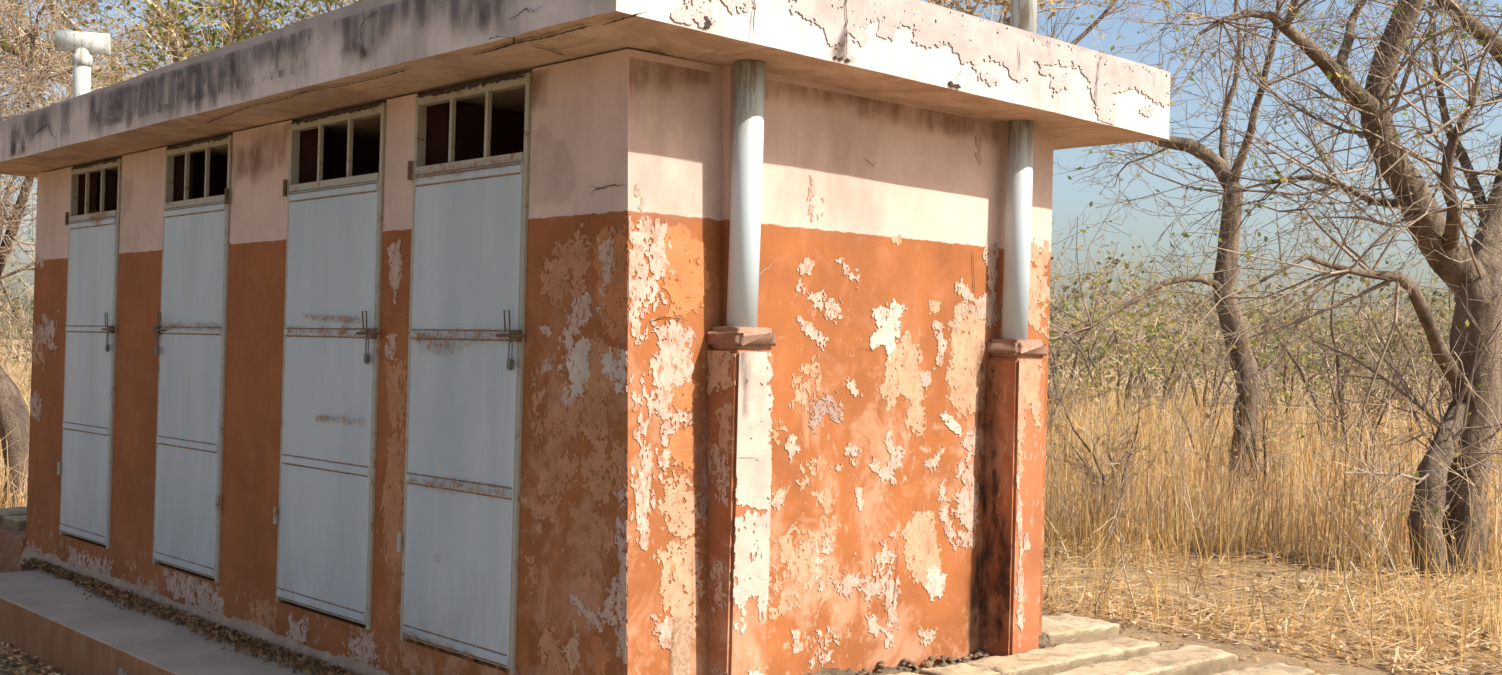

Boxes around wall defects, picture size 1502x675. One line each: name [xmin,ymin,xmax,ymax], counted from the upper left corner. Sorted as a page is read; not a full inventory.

damp [90,51,237,126]
damp [342,0,424,57]
peeling [790,0,1170,125]
damp [10,113,46,156]
peeling [387,239,403,304]
corrosion [287,315,380,337]
peeling [531,184,999,675]
damp [971,365,1012,638]